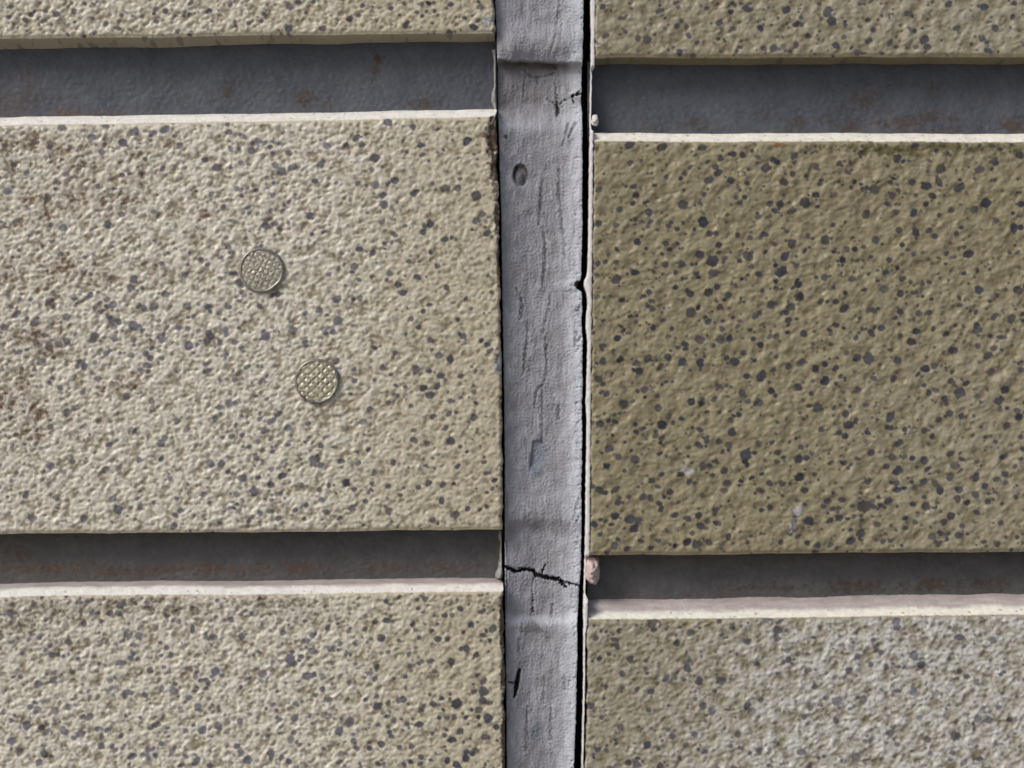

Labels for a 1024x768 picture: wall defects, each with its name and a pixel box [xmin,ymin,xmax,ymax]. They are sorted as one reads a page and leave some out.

crack [506,564,579,611]